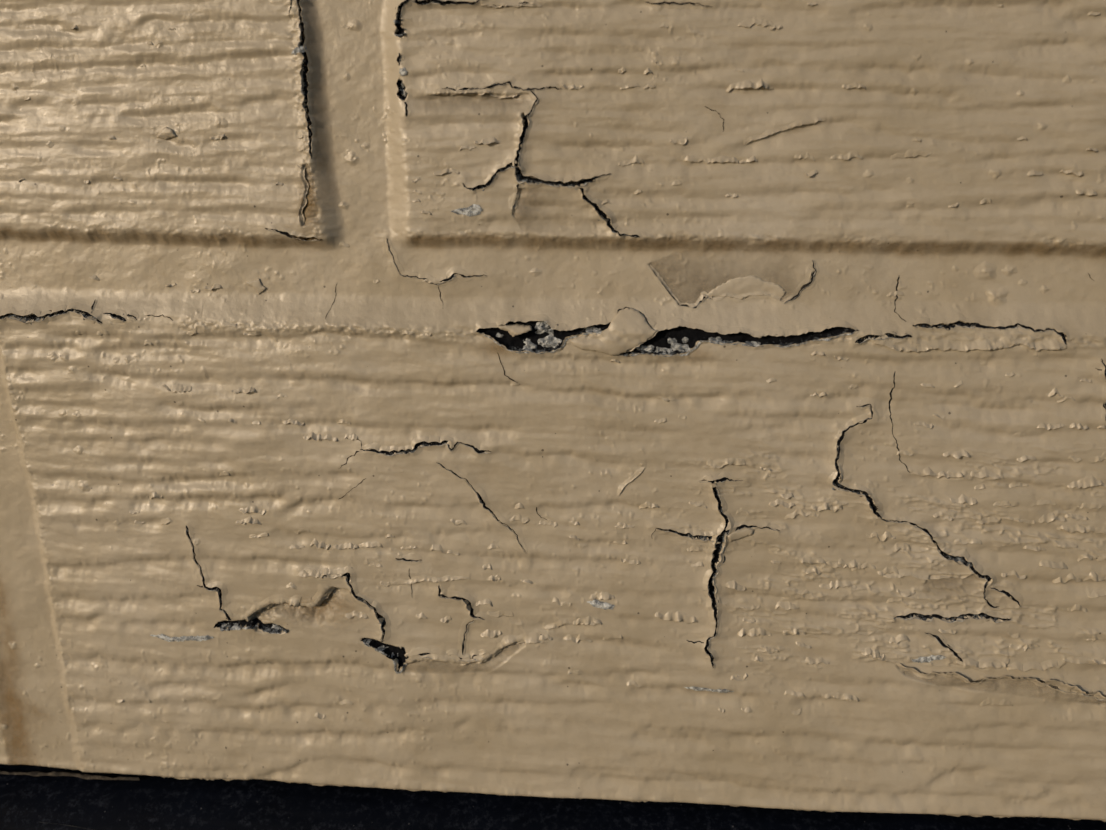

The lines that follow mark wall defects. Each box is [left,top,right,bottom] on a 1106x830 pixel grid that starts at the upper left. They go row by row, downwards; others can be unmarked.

crack [289,0,319,159]
crack [442,76,641,242]
crack [0,299,173,325]
spalling [475,263,859,363]
crack [854,277,1070,346]
crack [303,553,492,664]
crack [339,436,547,554]
crack [651,472,780,668]
peeling [806,557,973,597]
crack [827,372,1024,662]
peeling [910,467,1028,505]
peeling [986,590,1019,608]